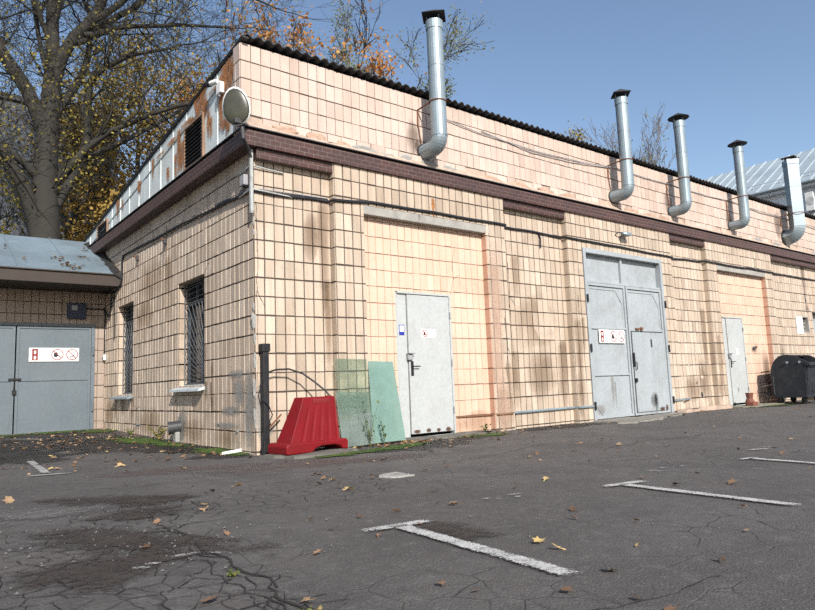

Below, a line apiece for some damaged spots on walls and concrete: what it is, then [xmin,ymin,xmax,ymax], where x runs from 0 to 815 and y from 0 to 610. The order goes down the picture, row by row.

corrosion [151,57,234,181]